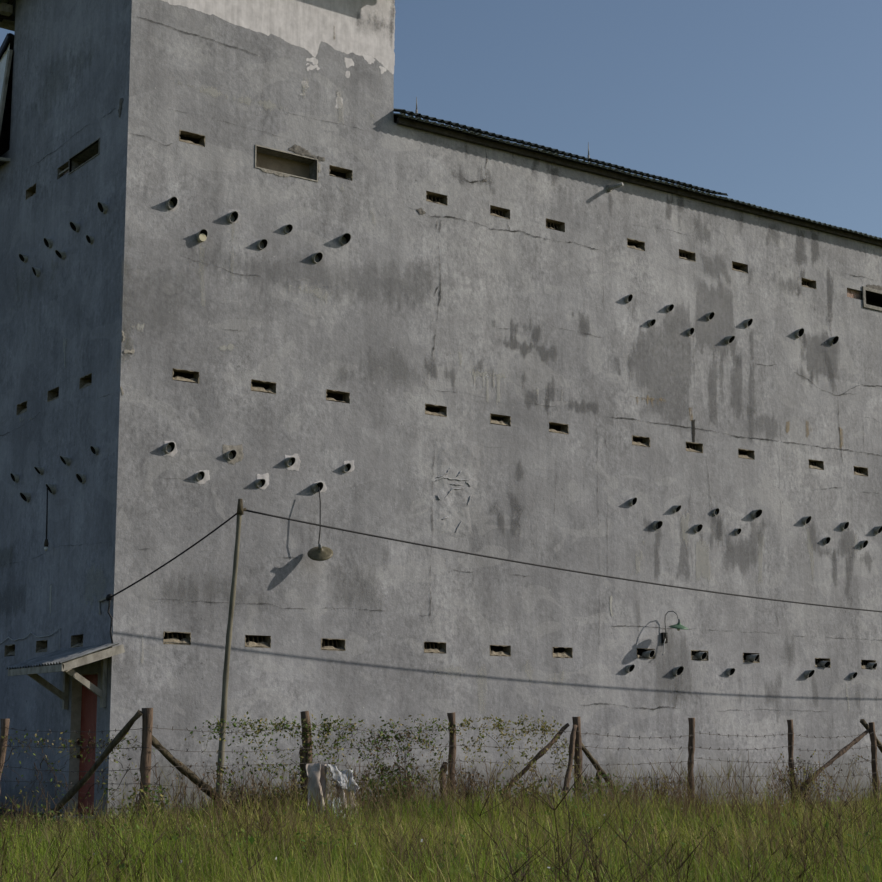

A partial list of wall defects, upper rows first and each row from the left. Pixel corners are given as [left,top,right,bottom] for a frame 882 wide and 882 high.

peeling [162,0,396,96]
damp [796,232,818,277]
crack [432,275,441,356]
damp [505,320,557,360]